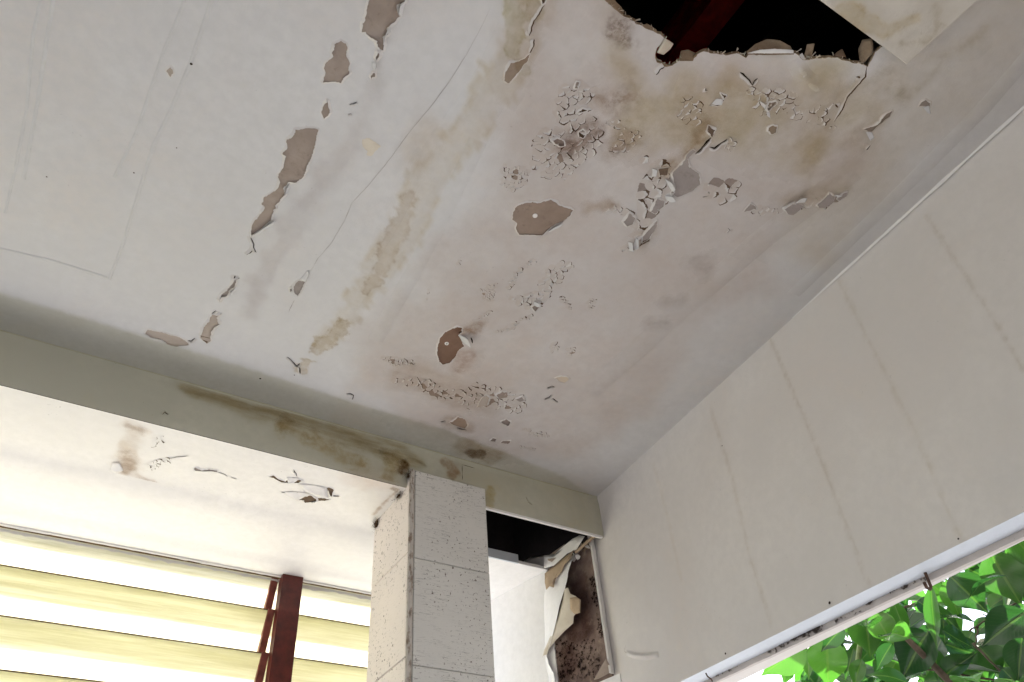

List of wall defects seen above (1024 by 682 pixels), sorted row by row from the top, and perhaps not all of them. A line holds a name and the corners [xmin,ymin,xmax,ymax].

spalling [605,0,883,67]